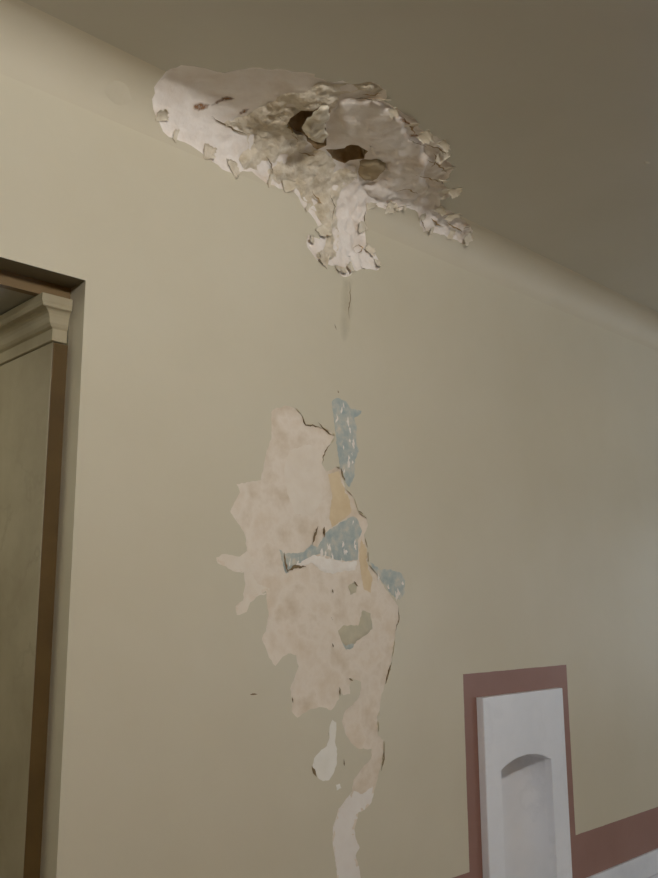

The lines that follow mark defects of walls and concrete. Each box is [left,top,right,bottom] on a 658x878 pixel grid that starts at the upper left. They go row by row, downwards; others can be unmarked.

peeling [216,398,405,878]